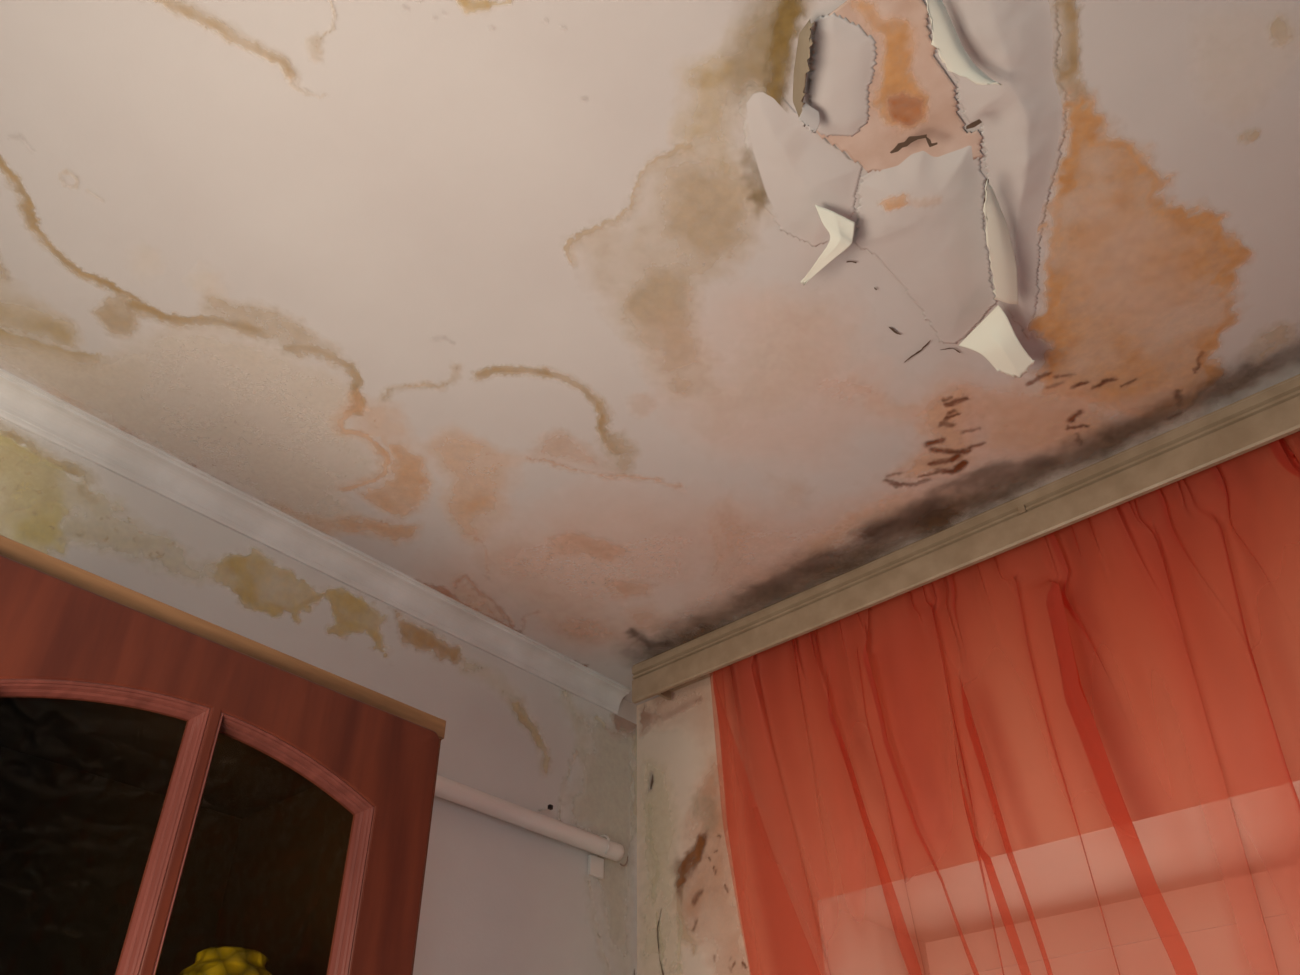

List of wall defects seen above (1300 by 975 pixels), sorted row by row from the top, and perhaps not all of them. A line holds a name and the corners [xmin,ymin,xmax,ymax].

leakage [154,0,294,78]
leakage [457,0,511,13]
peeling [738,0,1068,379]
leakage [0,156,270,337]
leakage [284,330,366,415]
leakage [475,366,621,454]
leakage [626,0,1279,658]
leakage [0,432,170,563]
leakage [217,552,386,656]
leakage [399,621,461,662]
leakage [677,767,728,936]
crack [634,908,664,975]